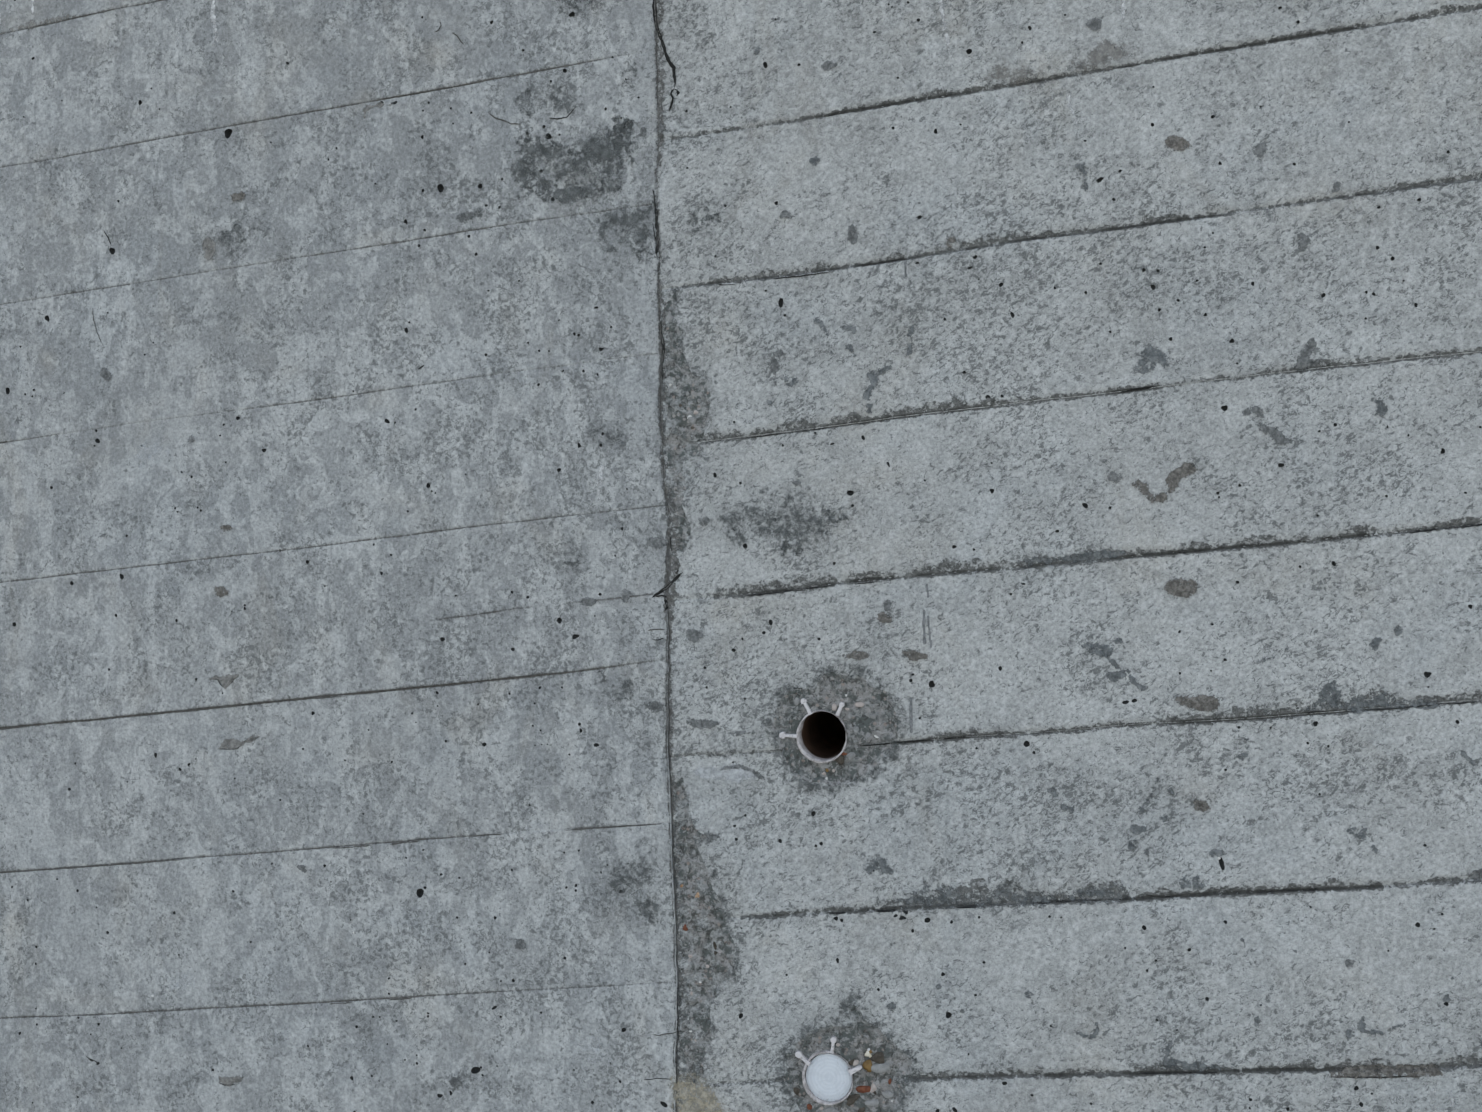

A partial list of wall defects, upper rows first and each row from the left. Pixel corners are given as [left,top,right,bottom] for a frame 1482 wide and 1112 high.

crack [652,0,678,111]
water stain [515,87,574,116]
water stain [513,117,633,203]